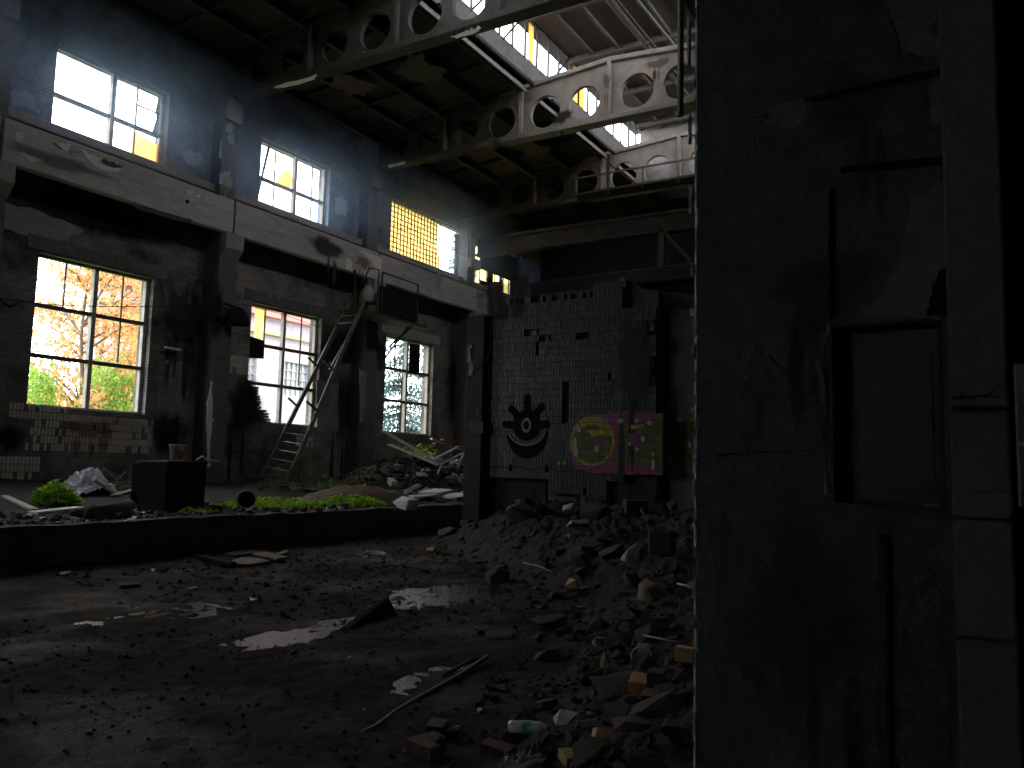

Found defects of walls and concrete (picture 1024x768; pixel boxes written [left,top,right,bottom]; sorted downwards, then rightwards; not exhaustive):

peeling [58,143,123,172]
leakage [313,236,342,284]
peeling [485,280,503,316]